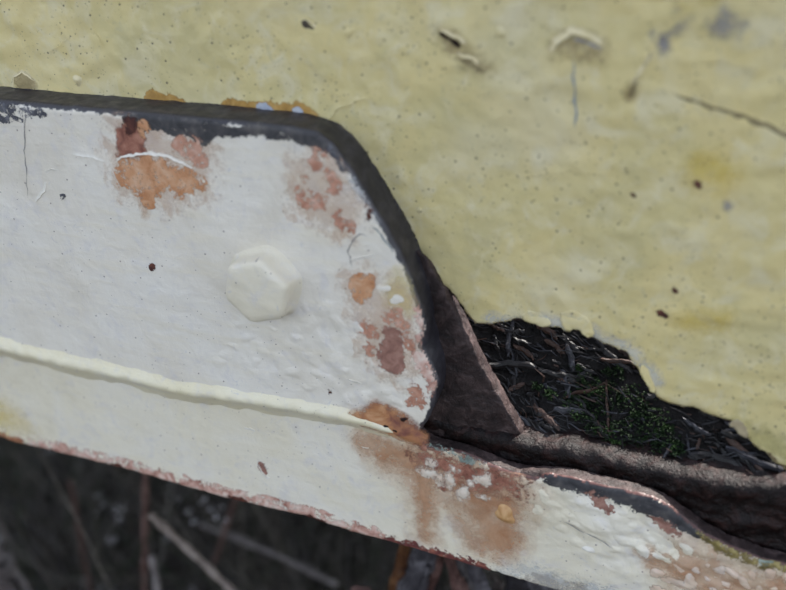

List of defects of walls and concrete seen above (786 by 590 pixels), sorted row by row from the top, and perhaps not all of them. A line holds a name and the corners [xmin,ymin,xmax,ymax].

peeling [12,69,37,89]
peeling [0,102,47,124]
crack [673,91,786,138]
rust [111,116,209,209]
peeling [521,310,594,337]
peeling [640,365,656,393]
peeling [729,419,748,438]
rust [0,432,491,570]
rust [356,437,534,553]
rust [423,420,786,553]
peeling [543,474,704,539]
rust [648,550,786,590]